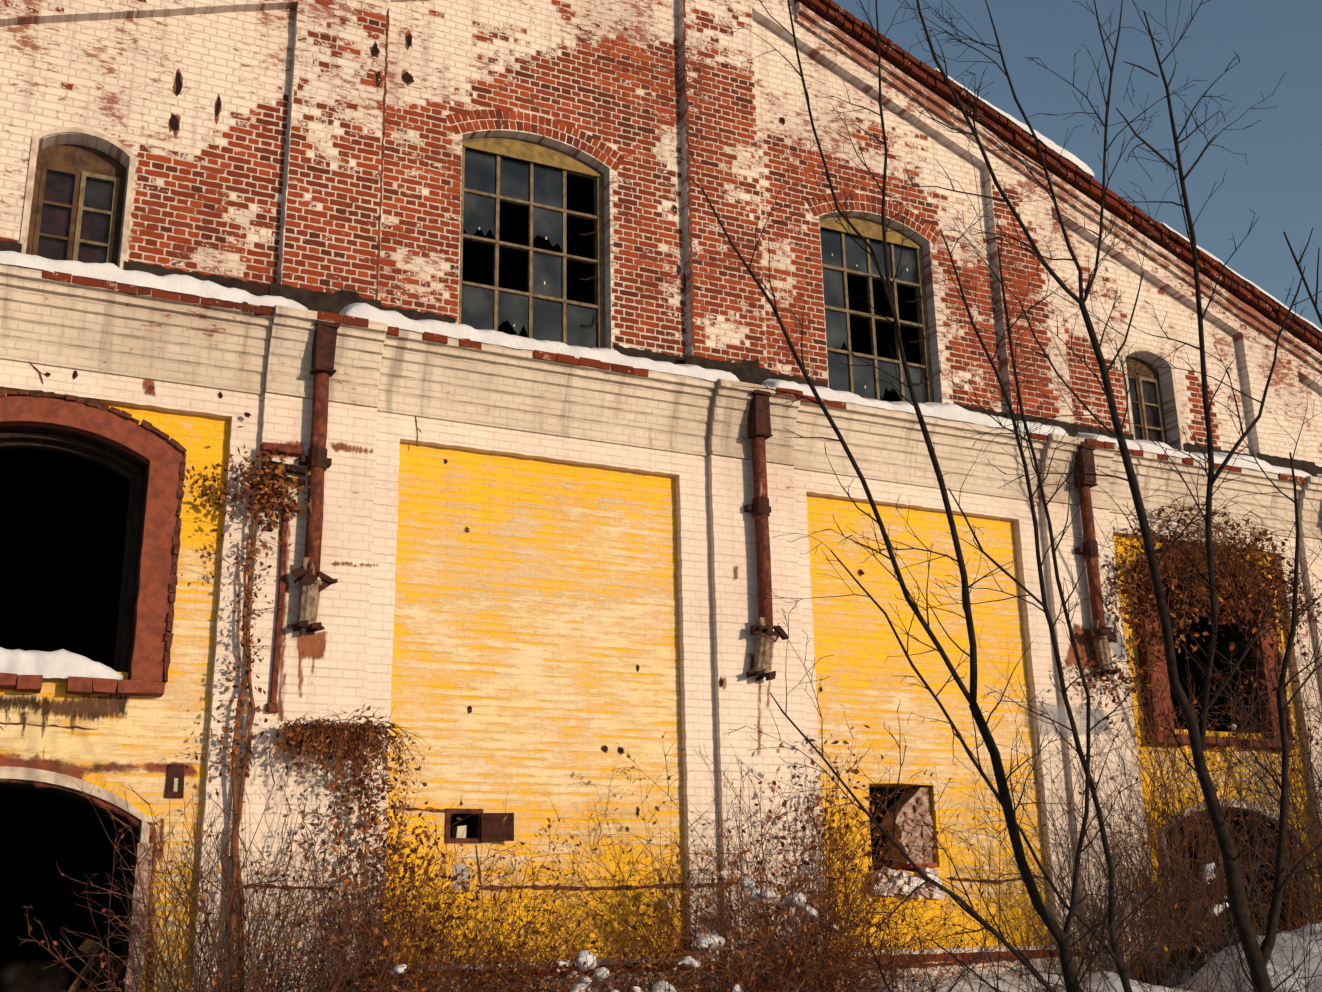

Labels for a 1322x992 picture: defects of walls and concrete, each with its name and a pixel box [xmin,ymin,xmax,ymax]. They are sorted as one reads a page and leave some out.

peeling [0,0,65,14]
peeling [128,0,1130,434]
peeling [1181,284,1226,314]
rust [332,443,373,453]
peeling [1186,371,1221,449]
rust [278,512,327,721]
rust [1065,625,1099,709]
damp [0,694,129,757]